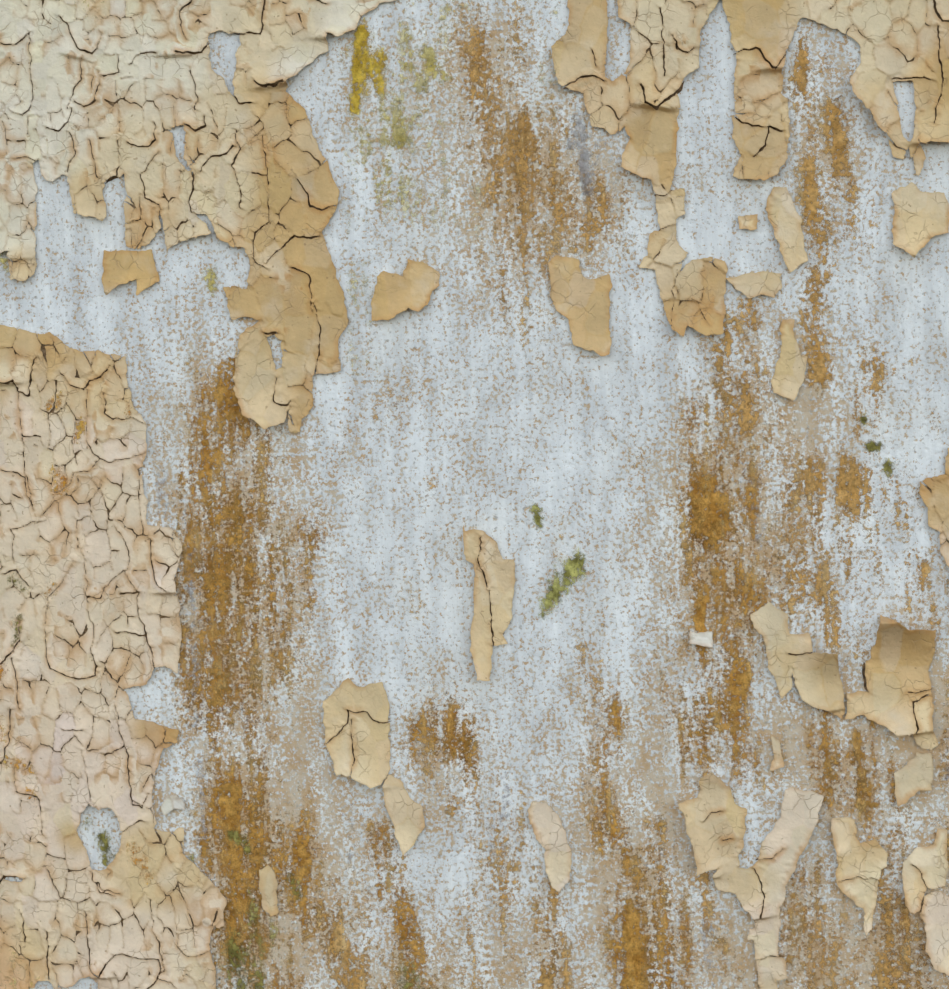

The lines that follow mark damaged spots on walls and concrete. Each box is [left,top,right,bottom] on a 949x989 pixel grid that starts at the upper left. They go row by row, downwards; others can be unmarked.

crack [47,0,209,224]
peeling [0,0,396,433]
crack [189,135,321,366]
rust [446,0,630,359]
peeling [551,0,782,337]
rust [784,33,880,399]
peeling [722,0,949,181]
crack [0,358,98,680]
crack [84,531,163,663]
peeling [0,325,259,989]
rust [171,348,745,989]
rust [647,298,949,795]